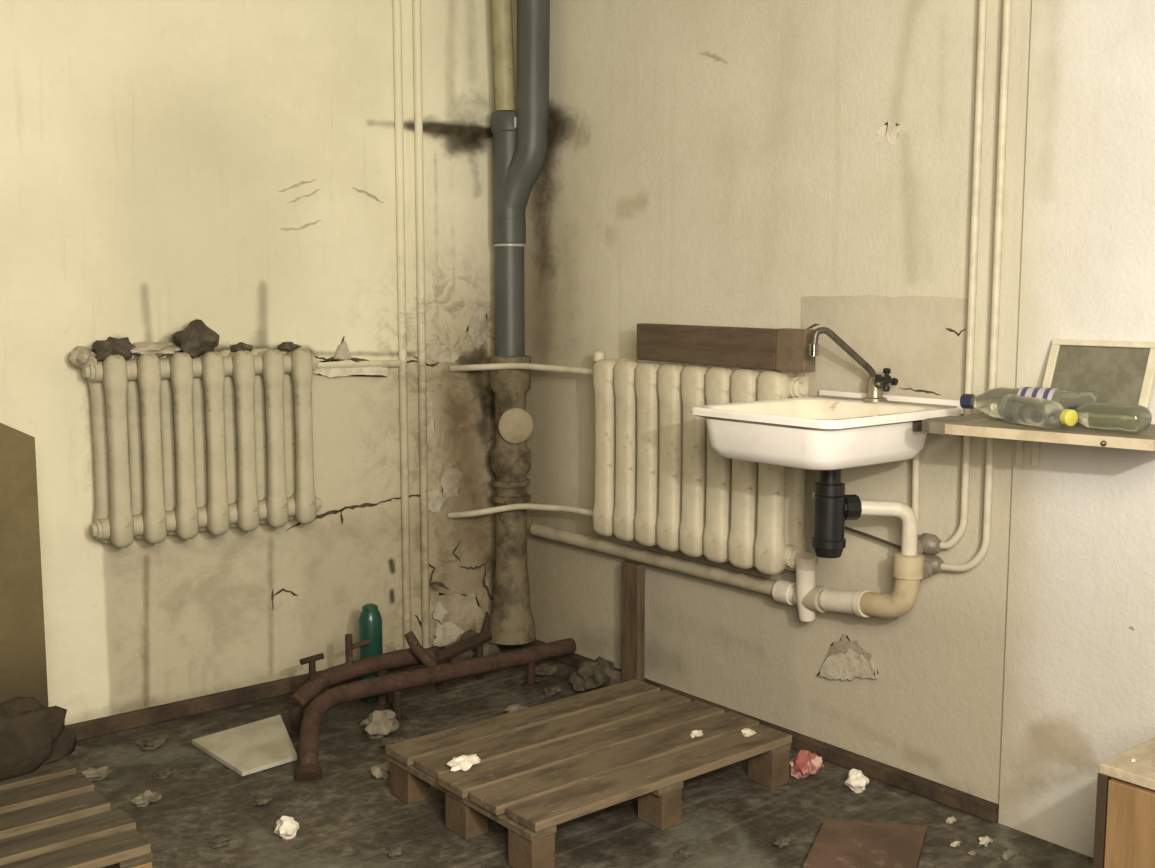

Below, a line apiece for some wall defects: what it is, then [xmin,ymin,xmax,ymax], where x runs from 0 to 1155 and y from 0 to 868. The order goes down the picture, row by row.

water stain [405,122,492,139]
water stain [542,106,568,171]
water stain [461,351,495,434]
crack [286,494,420,531]
flaking render [428,463,462,513]
flaking render [429,590,484,647]
flaking render [817,633,879,681]